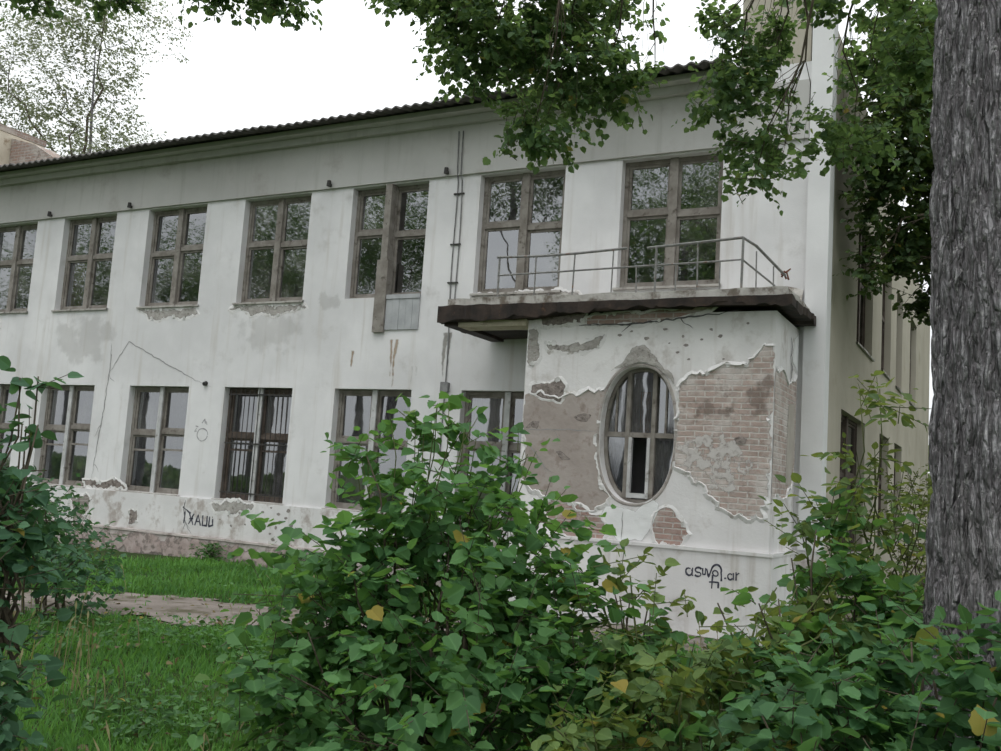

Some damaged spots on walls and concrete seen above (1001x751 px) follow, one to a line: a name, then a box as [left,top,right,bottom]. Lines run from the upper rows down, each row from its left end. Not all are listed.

flaking render [137,305,200,323]
flaking render [228,301,309,319]
crack [92,341,201,473]
flaking render [520,307,799,539]
flaking render [69,476,293,568]
flaking render [650,504,692,546]